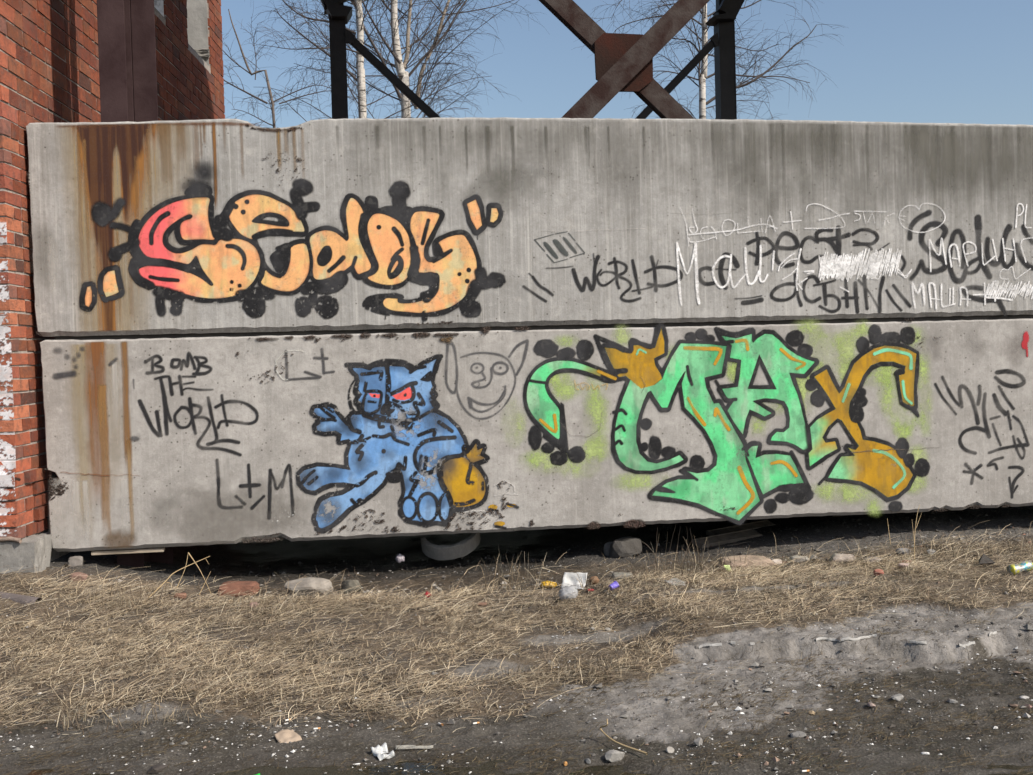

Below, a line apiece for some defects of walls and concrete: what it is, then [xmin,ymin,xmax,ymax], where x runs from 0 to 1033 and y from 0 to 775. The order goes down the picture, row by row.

peeling [0,260,14,420]
corrosion [71,122,252,505]
peeling [0,432,17,536]